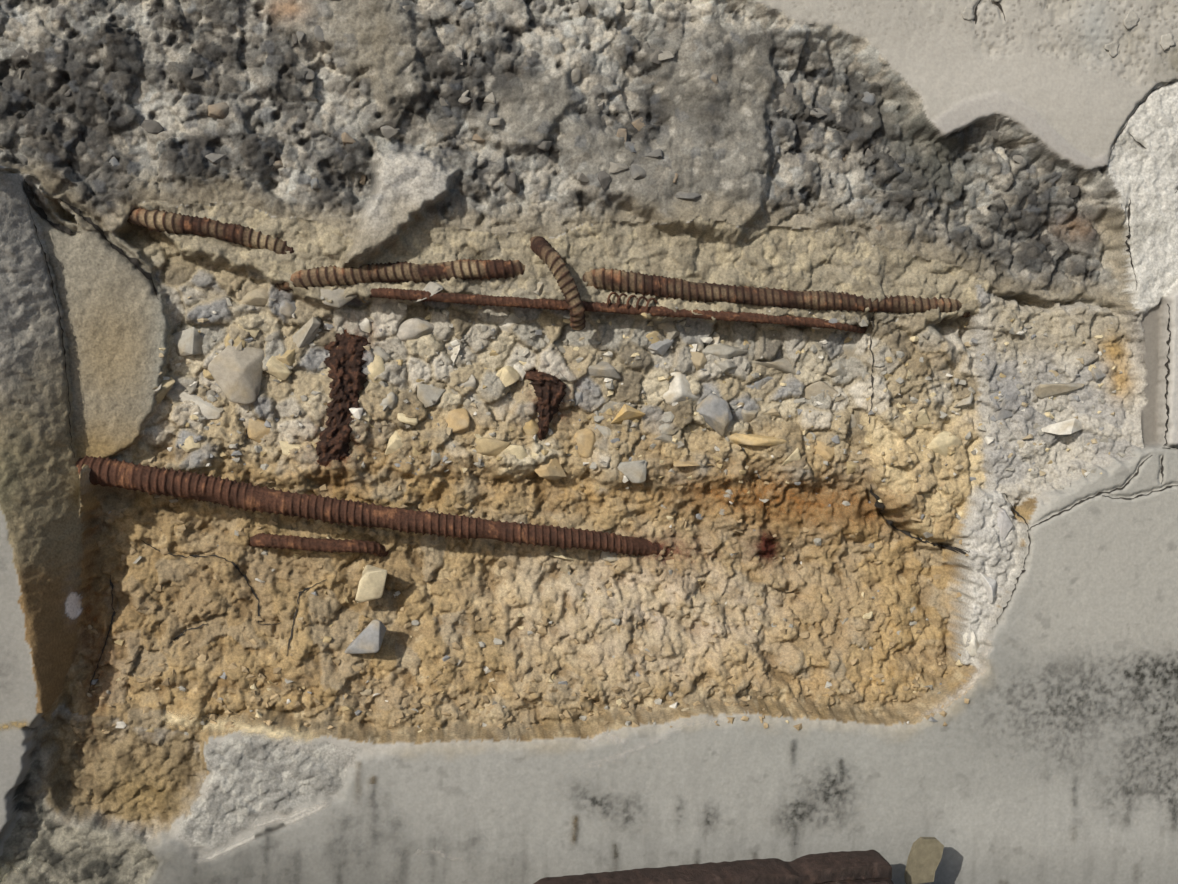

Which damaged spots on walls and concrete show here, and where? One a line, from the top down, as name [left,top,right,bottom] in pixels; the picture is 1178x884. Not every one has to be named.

crack [974,0,1005,24]
spalling [0,0,1178,313]
crack [24,179,159,458]
corrosion [316,329,371,467]
corrosion [524,368,567,441]
spalling [0,168,1149,884]
crack [870,484,970,554]
crack [995,304,1178,625]
crack [88,575,115,692]
crack [141,540,327,654]
leakage [1120,659,1178,745]